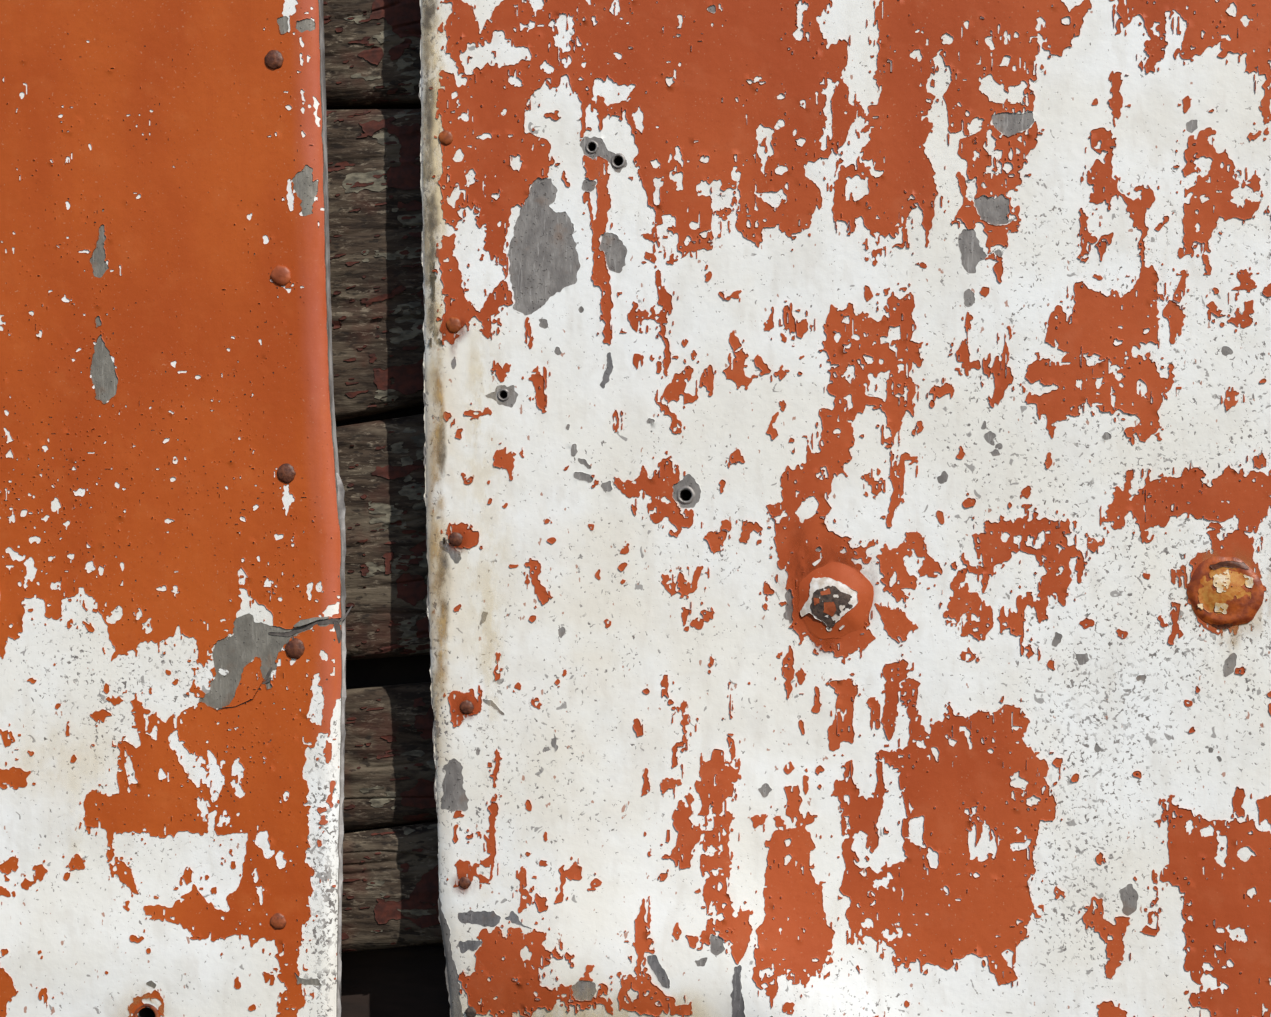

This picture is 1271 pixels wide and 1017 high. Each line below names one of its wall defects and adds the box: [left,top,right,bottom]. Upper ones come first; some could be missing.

leakage [423,83,442,264]
peeling [79,209,122,278]
peeling [29,290,127,417]
peeling [264,0,1271,1017]
crack [268,606,352,643]
rust [814,588,836,617]
rust [1198,566,1251,614]
crack [217,667,272,710]
peeling [0,396,693,1017]